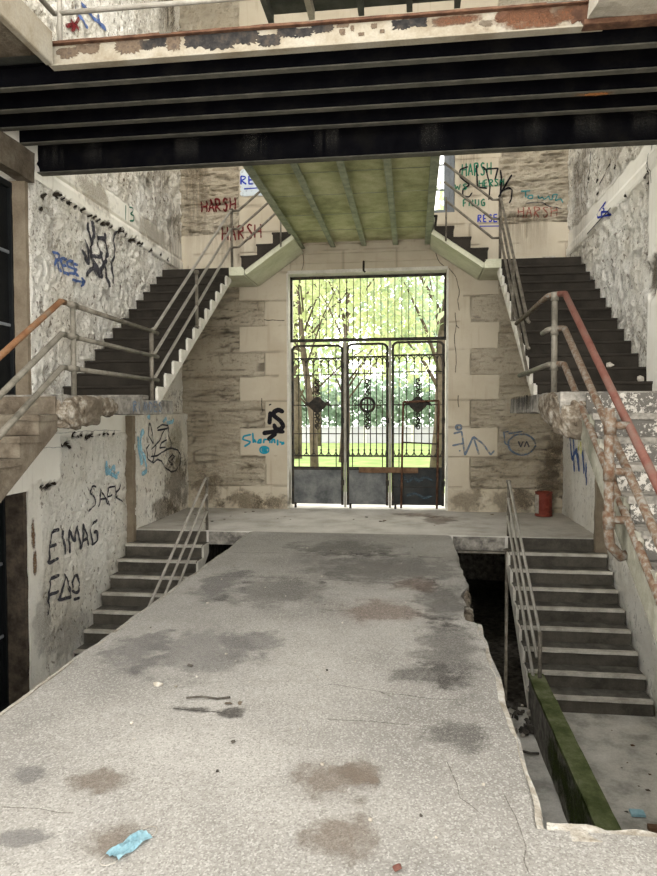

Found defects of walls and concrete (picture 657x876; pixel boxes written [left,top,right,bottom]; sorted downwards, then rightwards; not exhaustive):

peeling [114,4,589,55]
corrosion [434,15,478,26]
corrosion [495,5,581,30]
peeling [56,43,100,59]
spalling [56,395,118,449]
spalling [462,590,544,829]
leakage [299,762,378,791]